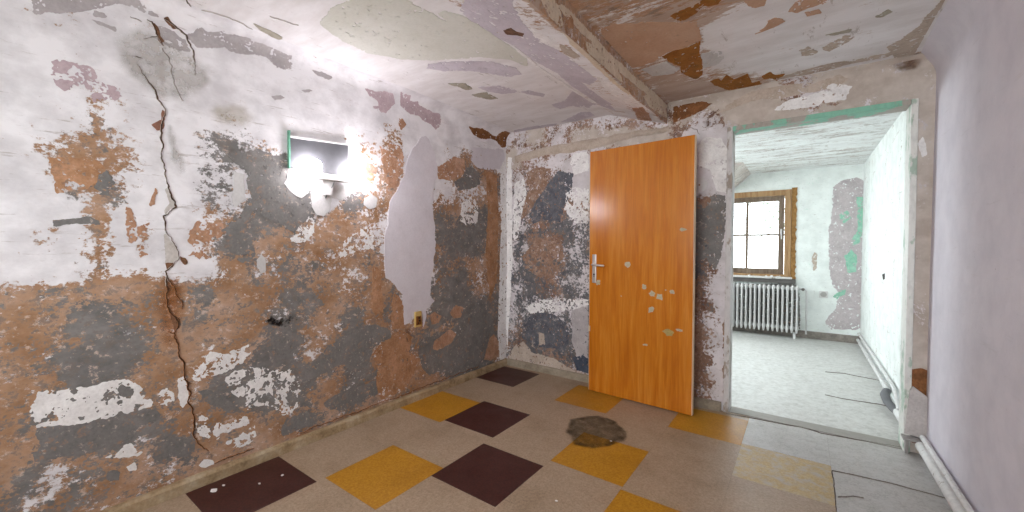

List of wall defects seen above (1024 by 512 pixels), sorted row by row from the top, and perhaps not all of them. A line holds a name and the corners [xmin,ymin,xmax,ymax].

spalling [152,110,165,131]
peeling [53,216,100,227]
peeling [48,157,115,196]
peeling [125,207,149,258]
spalling [149,188,178,214]
crack [130,0,299,464]
peeling [164,147,314,269]
peeling [320,0,945,374]
peeling [694,275,703,397]
peeling [29,294,418,481]
leakage [567,416,624,447]